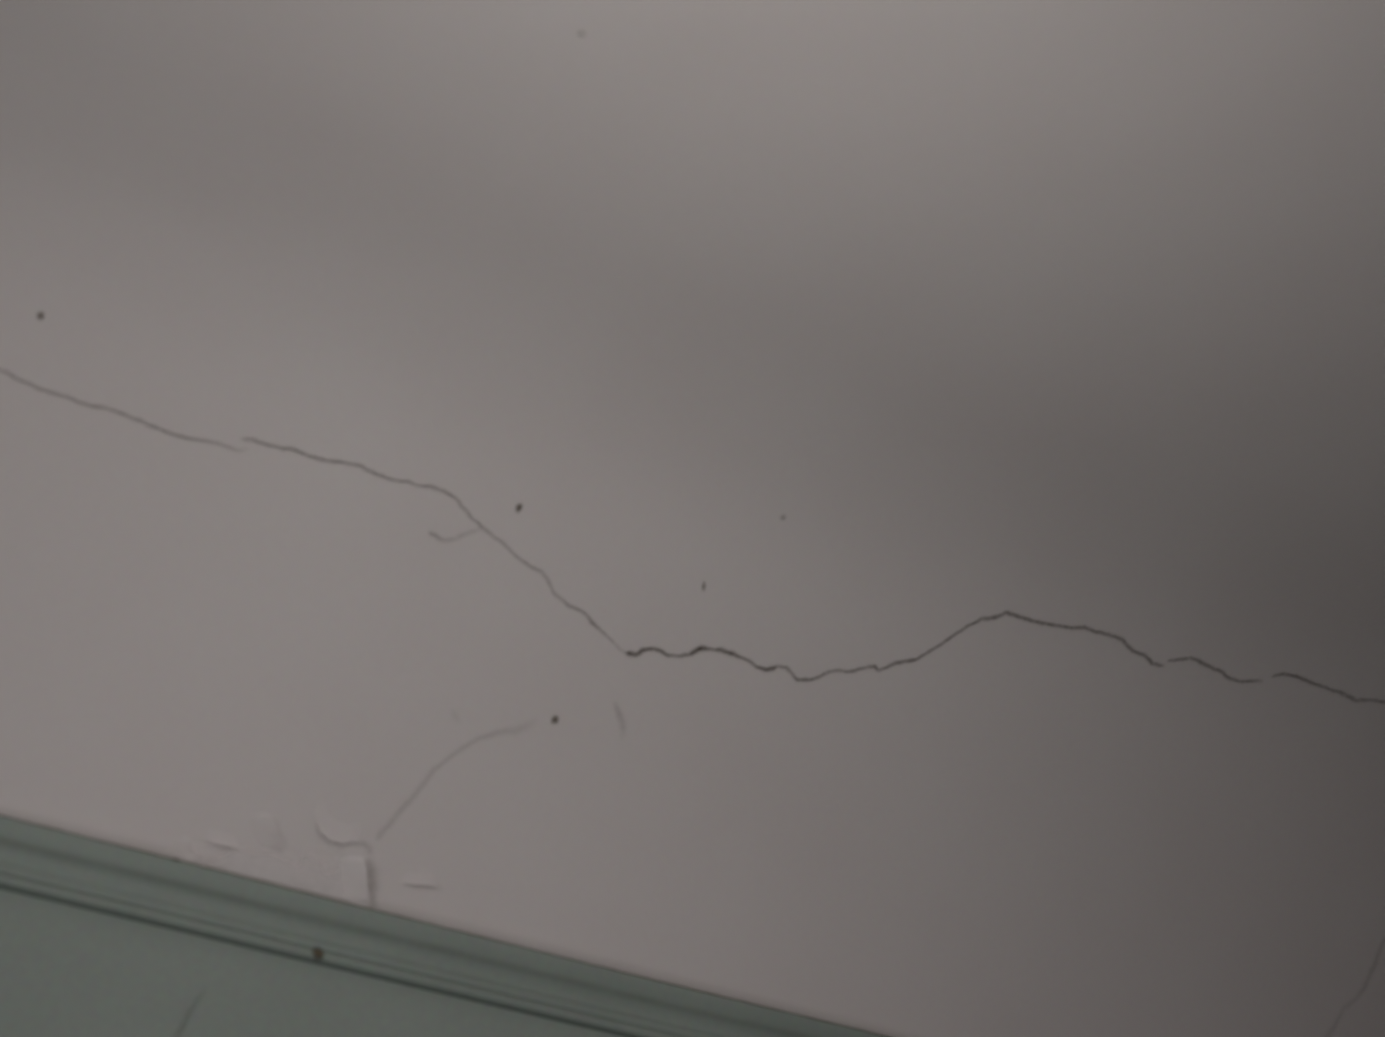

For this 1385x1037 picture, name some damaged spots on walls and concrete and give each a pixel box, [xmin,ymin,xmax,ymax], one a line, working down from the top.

crack [628,646,818,681]